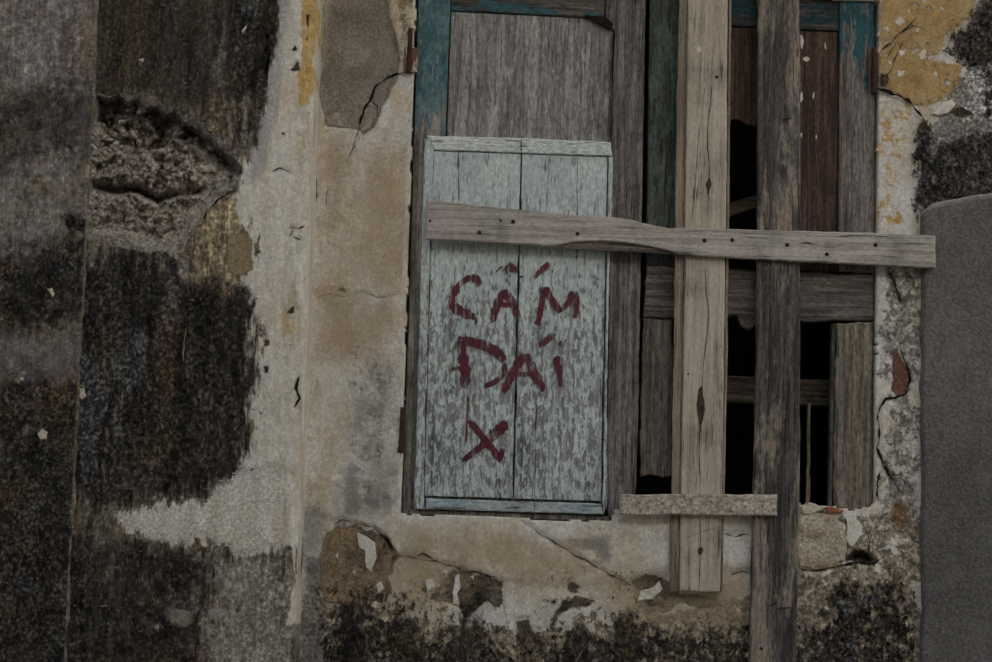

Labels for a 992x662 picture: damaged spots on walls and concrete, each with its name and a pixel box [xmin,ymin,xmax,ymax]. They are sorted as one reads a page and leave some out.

peeling [319,0,413,134]
crack [349,73,402,155]
crack [877,17,926,117]
peeling [880,0,976,116]
damp [942,2,992,67]
spalling [61,91,240,259]
damp [910,118,992,234]
crack [876,339,912,500]
peeling [425,569,503,617]
damp [299,572,750,662]
crack [520,519,665,603]
damp [797,553,915,662]